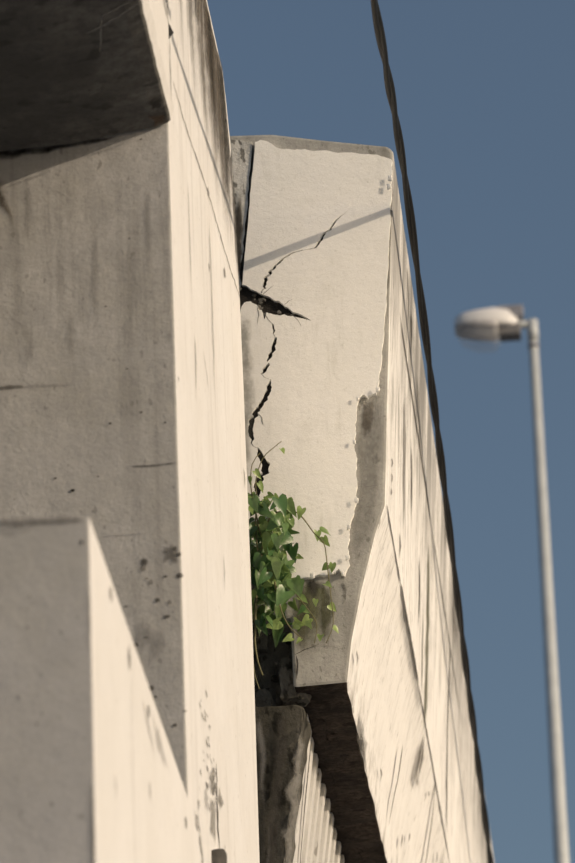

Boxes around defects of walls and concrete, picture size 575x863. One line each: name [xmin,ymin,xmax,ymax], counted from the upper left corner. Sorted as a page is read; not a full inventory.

damp [189,0,239,274]
flaking render [347,397,379,541]
damp [268,718,303,863]
peeling [358,722,366,765]